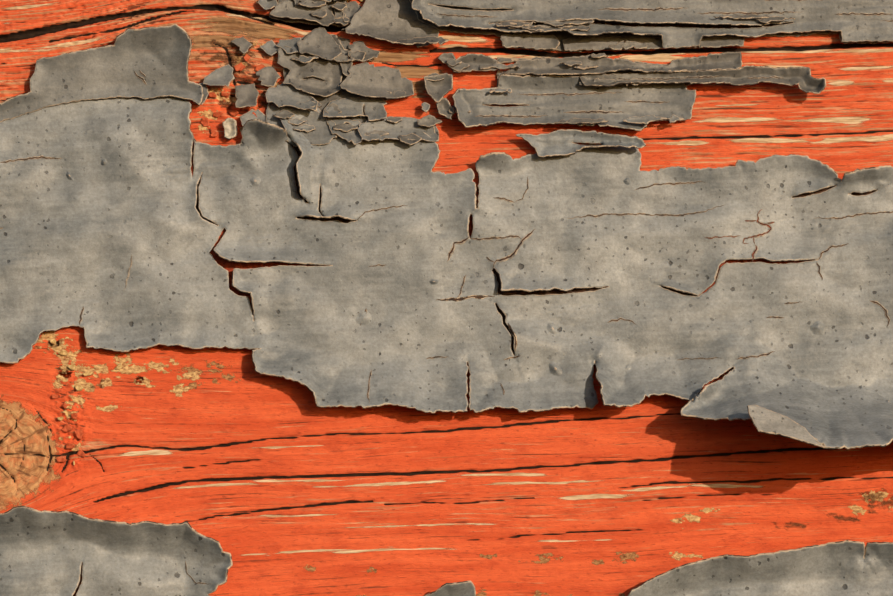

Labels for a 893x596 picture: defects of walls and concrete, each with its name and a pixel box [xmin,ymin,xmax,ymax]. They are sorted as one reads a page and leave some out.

crack [0,4,348,64]
peeling [0,0,893,450]
crack [567,205,723,219]
crack [661,209,849,296]
crack [792,185,893,220]
crack [437,215,605,360]
crack [0,408,893,503]
peeling [0,506,233,596]
crack [187,497,535,522]
peeling [424,580,476,596]
crack [510,529,642,538]
peeling [627,540,893,596]